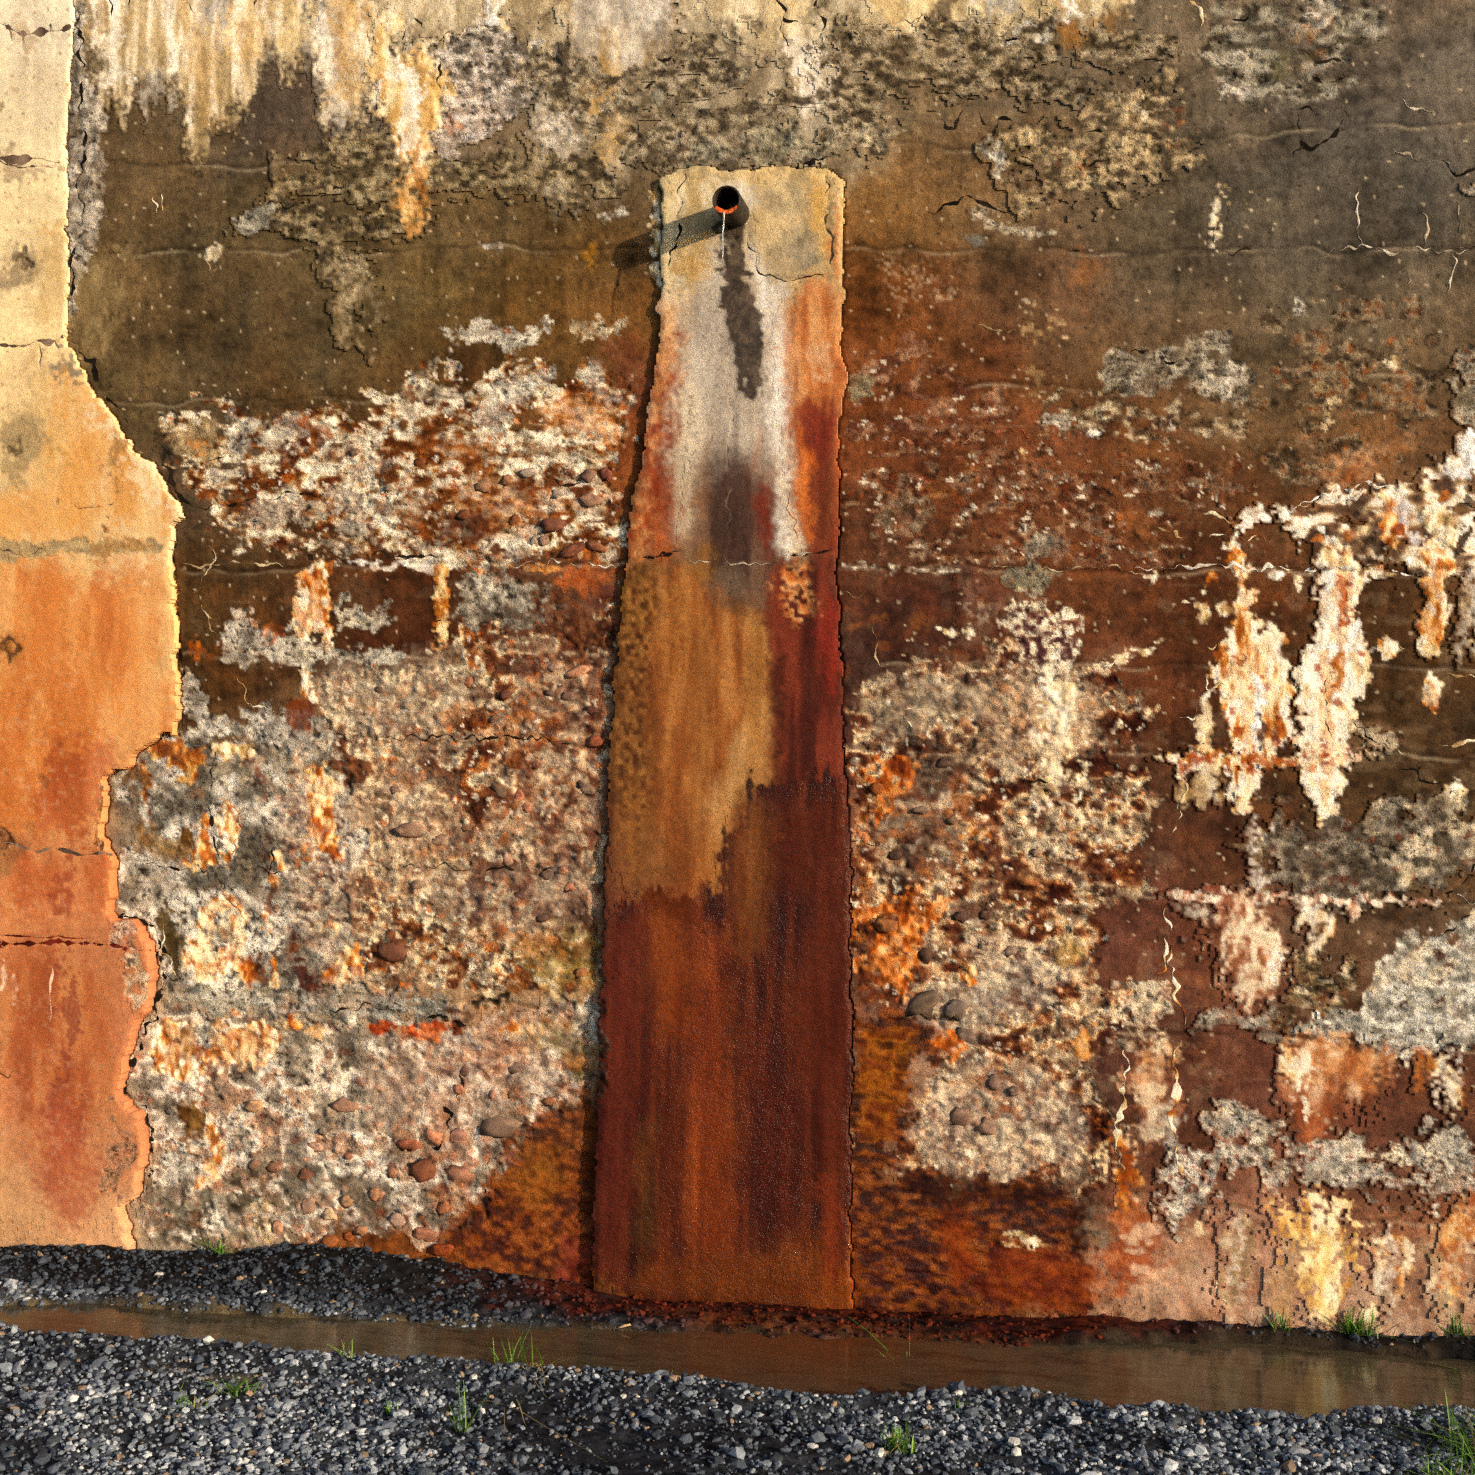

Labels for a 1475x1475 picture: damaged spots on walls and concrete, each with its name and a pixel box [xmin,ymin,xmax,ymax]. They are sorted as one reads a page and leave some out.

spalling [197,123,405,291]
leakage [83,0,1139,498]
leakage [1198,181,1253,253]
leakage [1318,188,1465,292]
crack [1392,150,1475,177]
corrosion [0,334,333,1246]
corrosion [231,819,369,994]
spalling [87,311,641,1256]
corrosion [503,172,927,893]
spalling [426,0,1475,1200]
corrosion [849,876,1201,1321]
leakage [841,426,1475,1181]